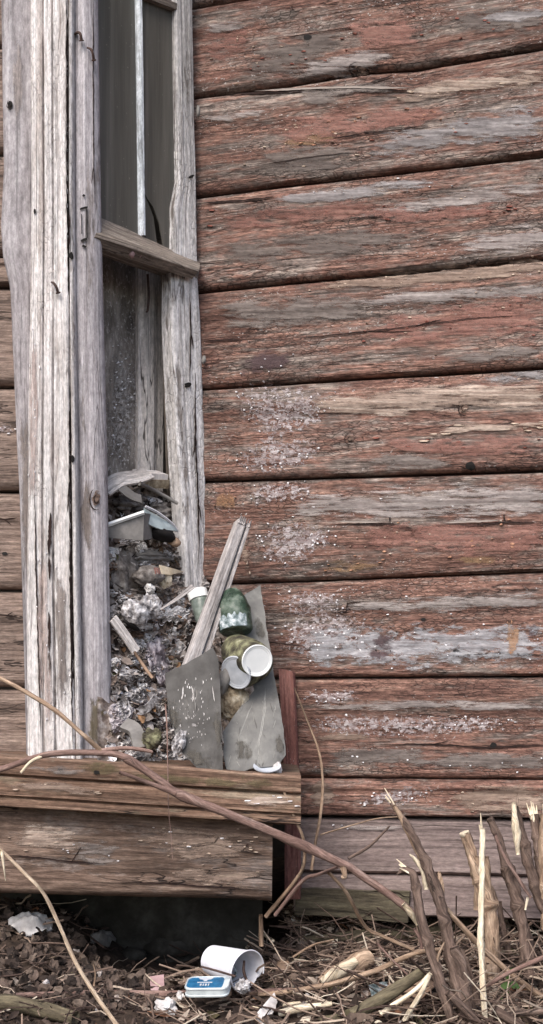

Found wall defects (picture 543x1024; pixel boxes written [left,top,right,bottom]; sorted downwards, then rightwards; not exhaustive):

peeling [245,15,424,104]
peeling [368,70,543,155]
peeling [277,177,543,220]
peeling [464,225,543,275]
damp [235,350,336,504]
damp [242,522,337,574]
damp [274,589,397,660]
damp [304,689,516,735]